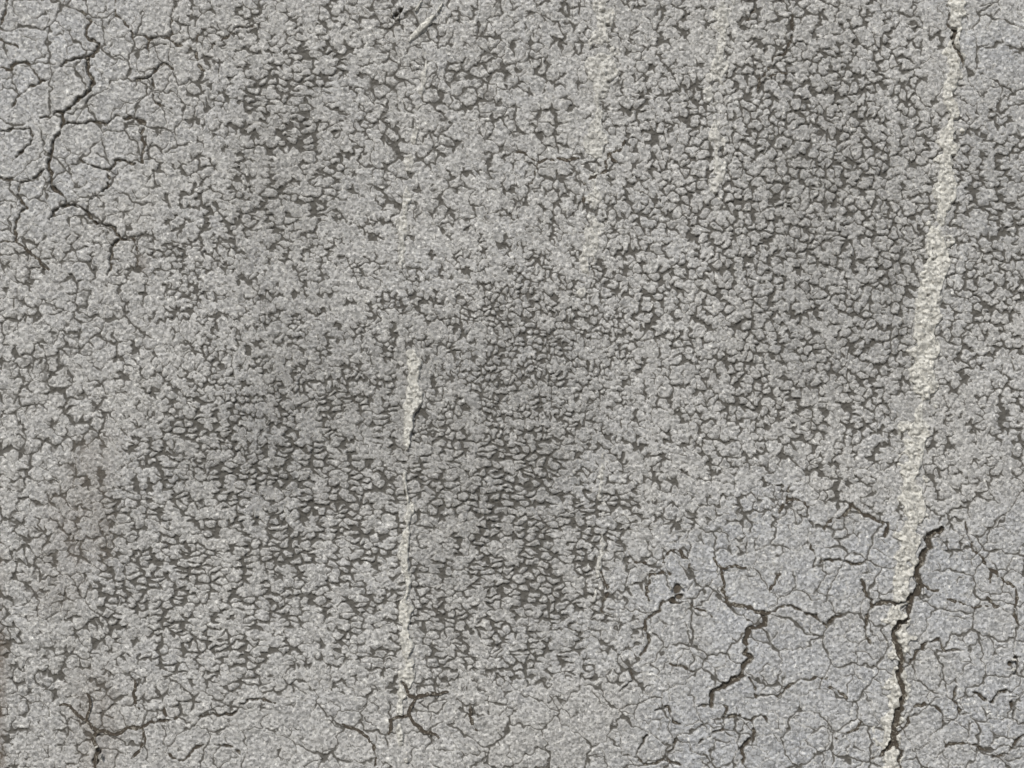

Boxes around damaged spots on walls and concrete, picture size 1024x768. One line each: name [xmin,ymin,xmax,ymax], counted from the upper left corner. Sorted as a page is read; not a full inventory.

crack [0,0,255,271]
crack [59,680,276,768]
crack [342,681,478,766]
crack [627,487,1020,768]